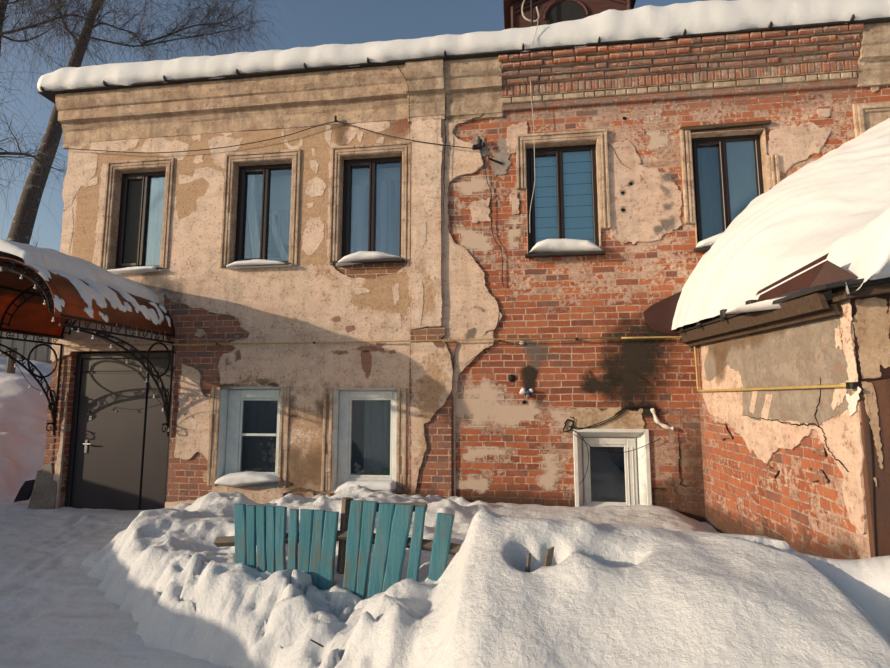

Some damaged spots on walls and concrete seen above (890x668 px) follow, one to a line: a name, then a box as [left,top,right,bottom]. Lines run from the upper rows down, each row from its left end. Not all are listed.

peeling [61,133,243,284]
peeling [281,129,327,255]
peeling [415,119,443,249]
peeling [469,197,491,223]
peeling [608,140,682,244]
flaking render [165,295,249,502]
damp [452,433,566,506]
damp [452,341,572,435]
peeling [566,407,645,434]
damp [581,320,671,417]
crack [652,433,693,491]
peeling [831,297,890,487]